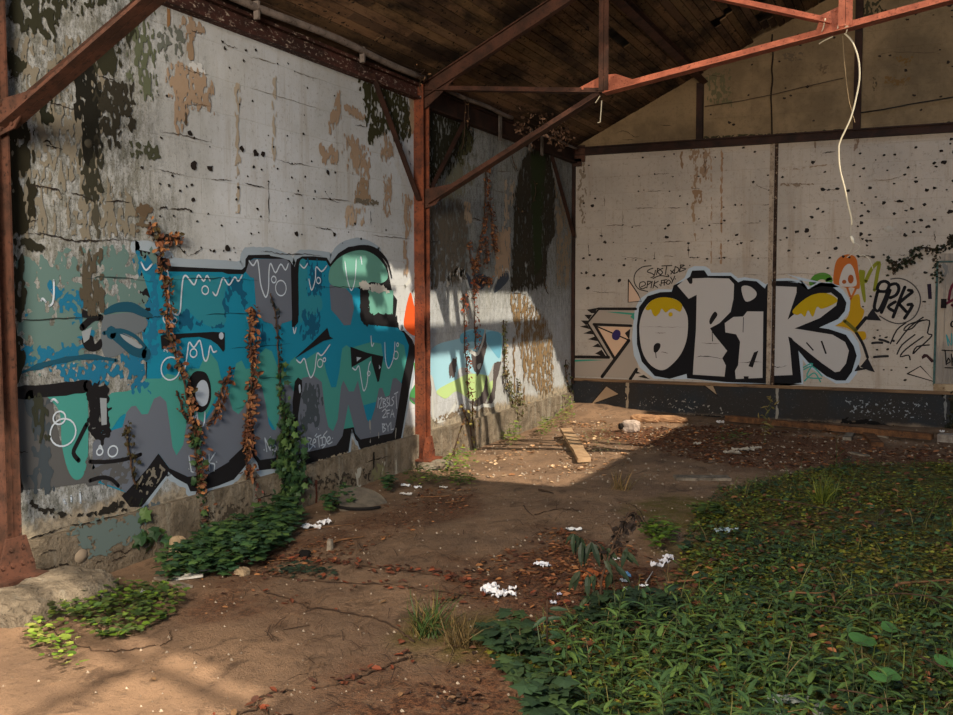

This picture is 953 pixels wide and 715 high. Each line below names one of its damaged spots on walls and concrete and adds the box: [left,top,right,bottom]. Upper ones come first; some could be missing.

leakage [126,11,186,101]
peeling [158,15,215,139]
leakage [11,81,136,243]
peeling [311,90,393,240]
peeling [382,174,414,276]